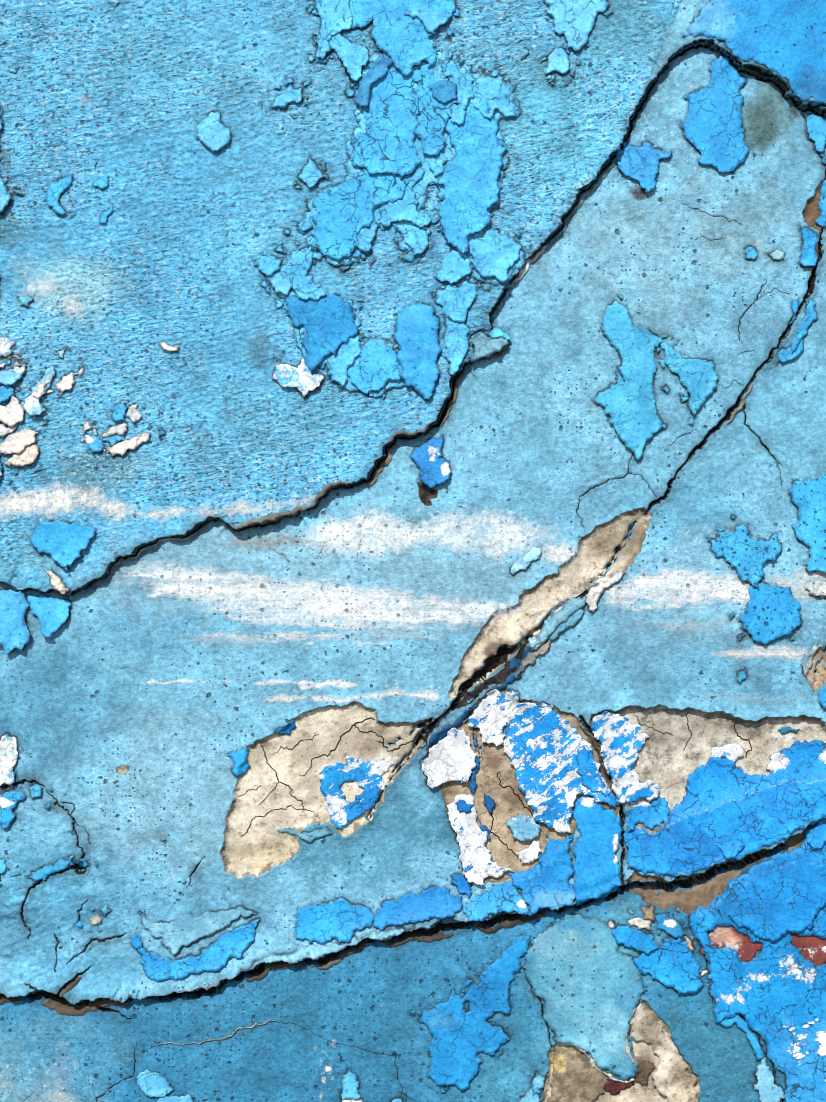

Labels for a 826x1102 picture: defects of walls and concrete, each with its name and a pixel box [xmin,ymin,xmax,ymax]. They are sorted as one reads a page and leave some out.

peeling [0,176,23,213]
peeling [46,175,73,215]
peeling [80,403,165,468]
peeling [252,0,525,401]
crack [1,40,826,596]
crack [369,225,823,817]
crack [0,715,812,1102]
peeling [131,508,826,1102]